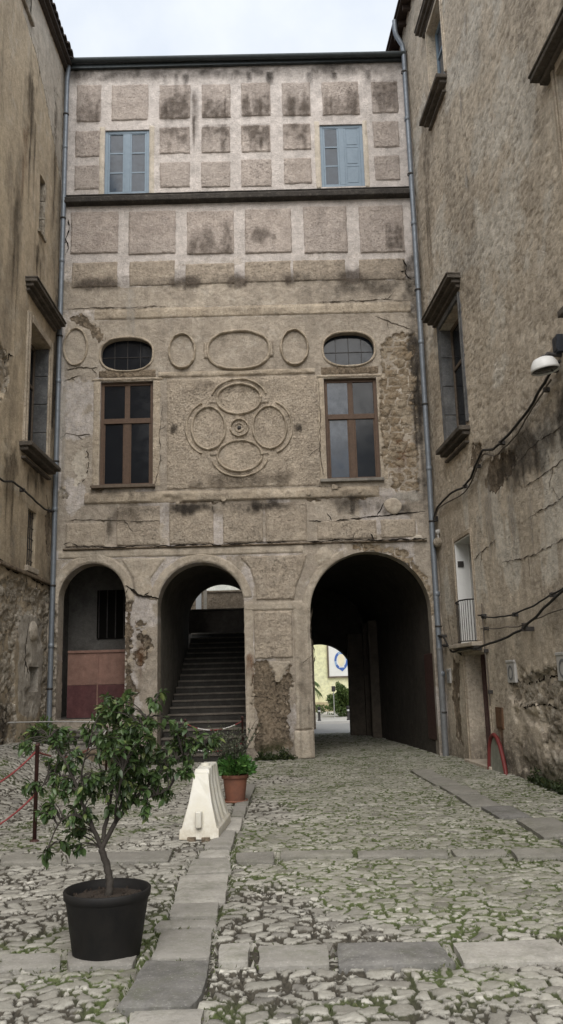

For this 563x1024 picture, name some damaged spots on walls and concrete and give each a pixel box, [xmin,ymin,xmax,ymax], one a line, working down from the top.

damp [161,95,228,146]
damp [243,94,269,143]
damp [287,97,310,137]
flaking render [70,313,106,343]
flaking render [378,332,421,493]
crack [518,426,563,517]
crack [46,495,427,548]
crack [474,539,563,577]
flaking render [0,575,58,745]
flaking render [124,602,154,716]
flaking render [250,660,295,753]